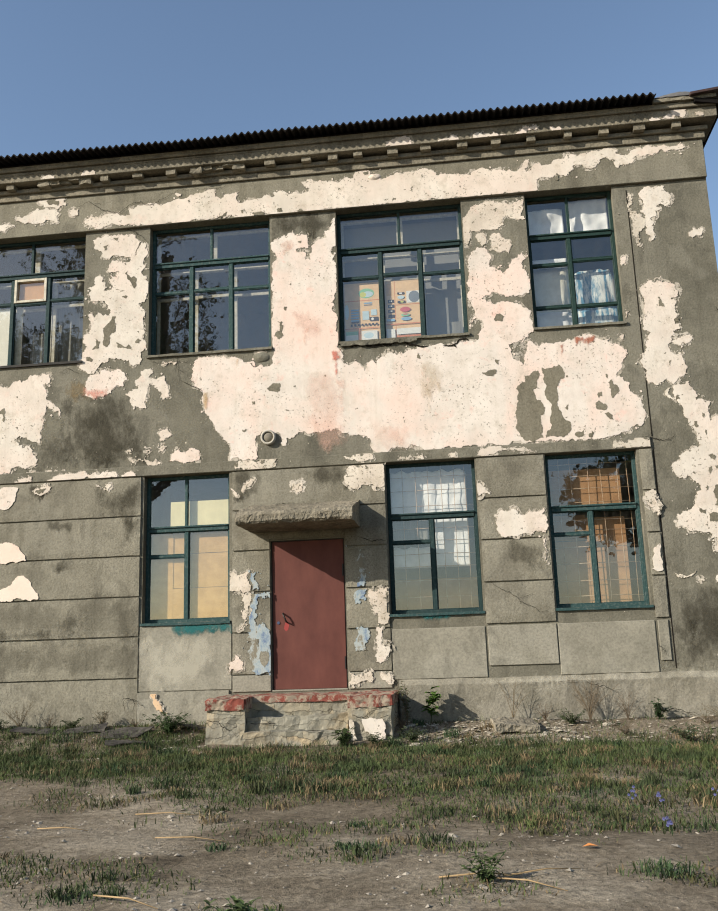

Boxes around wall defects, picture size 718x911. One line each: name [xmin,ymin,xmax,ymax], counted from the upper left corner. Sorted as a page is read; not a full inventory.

peeling [0,142,718,554]
damp [79,411,140,458]
peeling [0,542,26,564]
peeling [0,576,39,602]
peeling [492,504,550,565]
peeling [652,544,663,571]
peeling [675,573,718,584]
peeling [225,569,271,676]